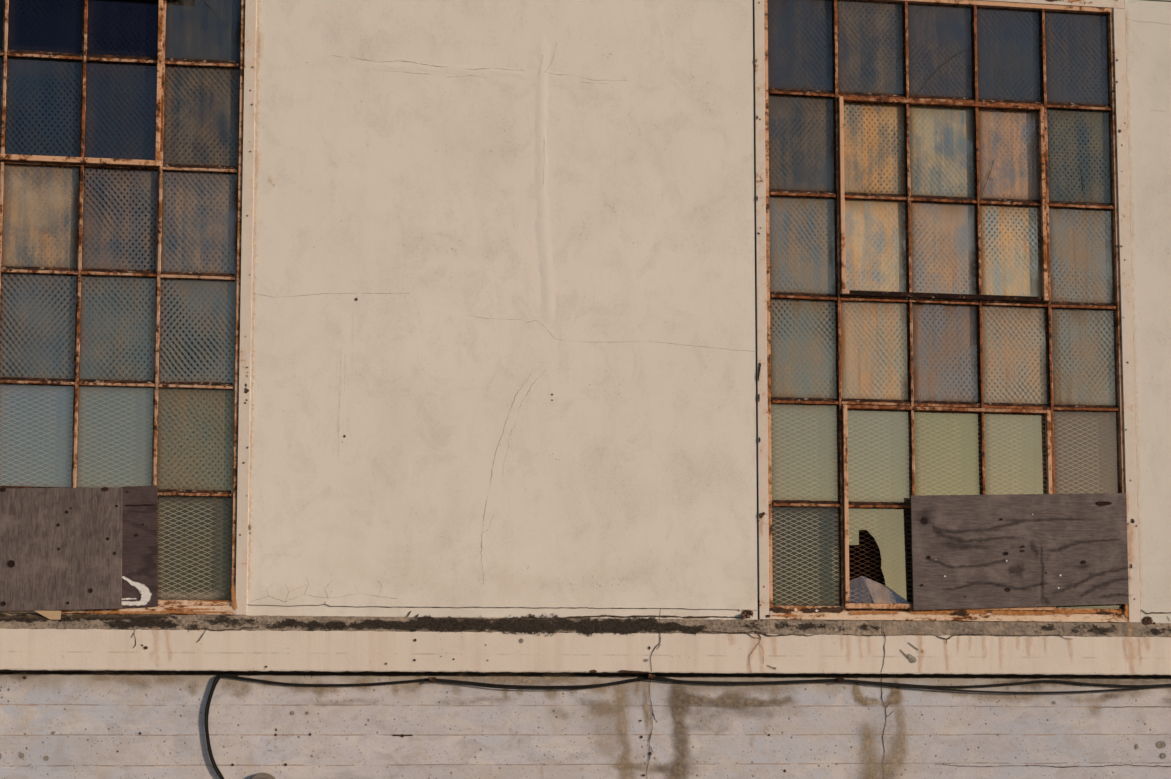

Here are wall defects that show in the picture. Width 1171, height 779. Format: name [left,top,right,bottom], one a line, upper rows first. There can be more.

leakage [0,613,707,636]
crack [173,603,814,775]
leakage [492,677,574,697]
leakage [596,686,650,779]
leakage [656,684,792,779]
leakage [854,683,906,779]
crack [844,622,1067,779]
crack [941,762,1171,770]